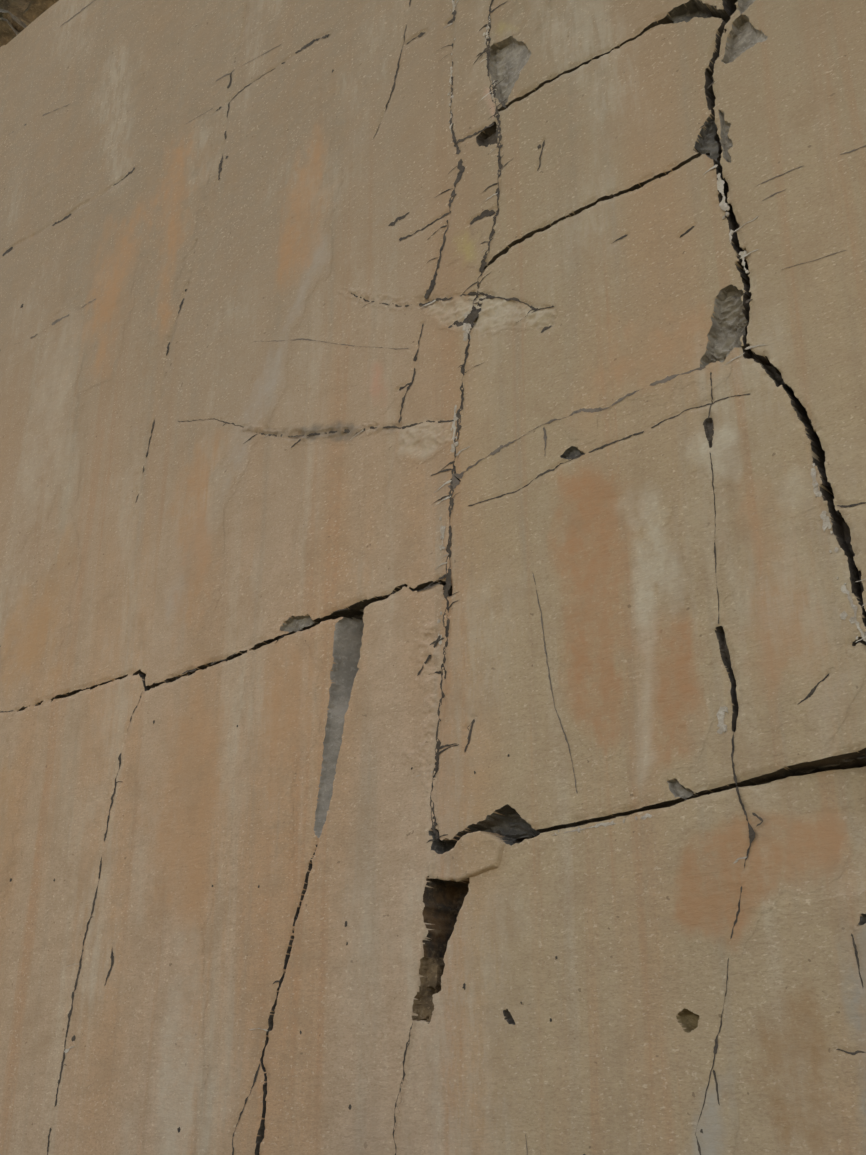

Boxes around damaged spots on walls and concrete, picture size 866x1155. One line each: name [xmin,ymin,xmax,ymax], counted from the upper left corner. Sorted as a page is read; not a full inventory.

spalling [486,36,531,109]
spalling [666,0,768,64]
spalling [337,284,414,314]
spalling [700,284,749,367]
crack [0,0,866,869]
spalling [428,804,541,854]
crack [47,753,121,1155]
crack [232,844,318,1155]
crack [393,1023,413,1155]
spalling [412,876,470,1024]
crack [695,958,729,1155]
crack [851,934,863,987]